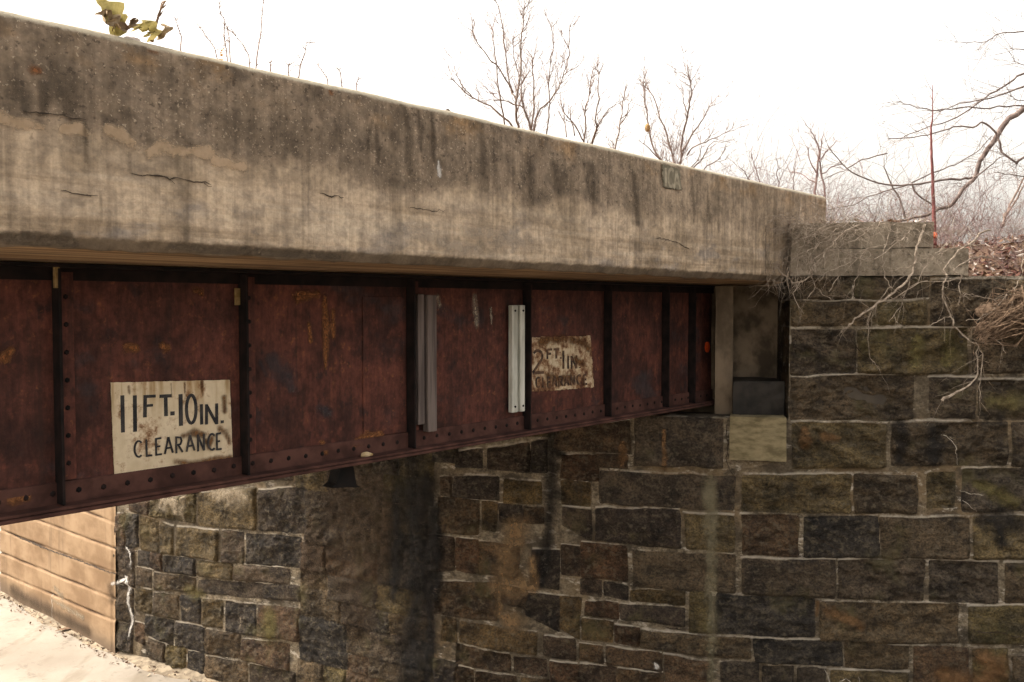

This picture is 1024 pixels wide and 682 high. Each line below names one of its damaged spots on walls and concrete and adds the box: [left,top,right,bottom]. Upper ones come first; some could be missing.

crack [131,173,212,187]
corrosion [538,337,590,382]
corrosion [174,427,232,465]
water stain [376,455,442,682]